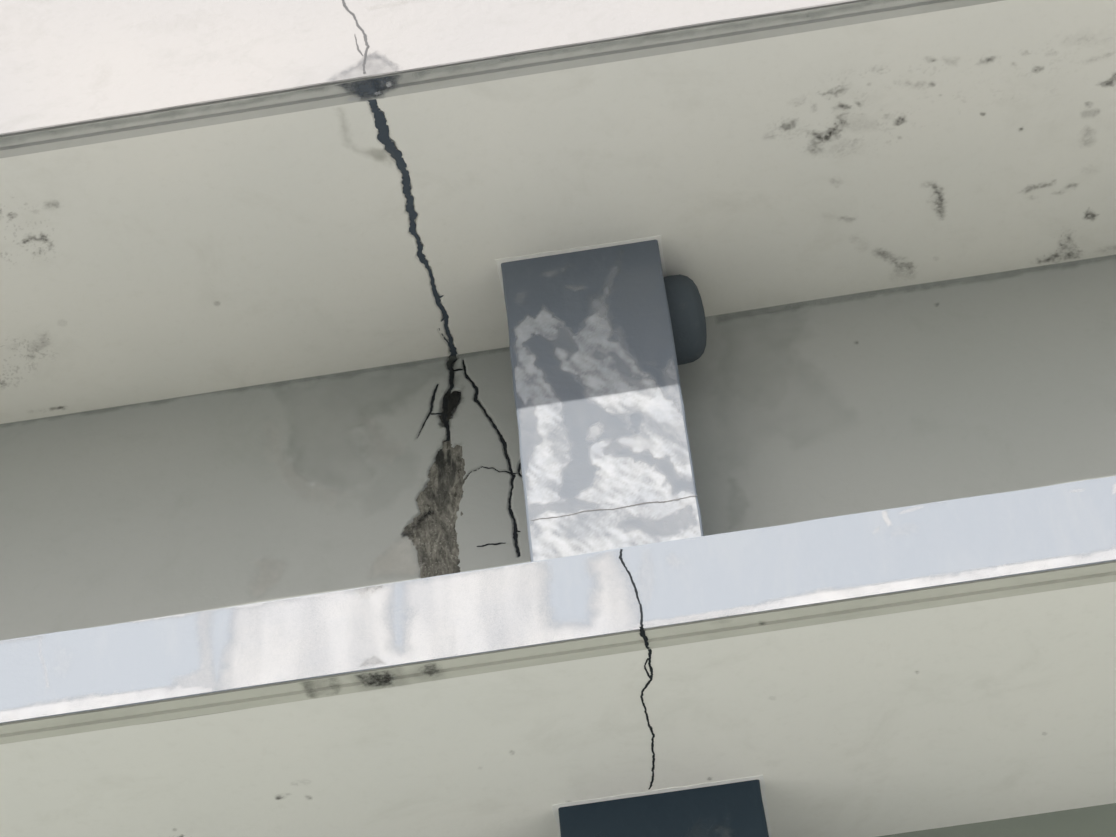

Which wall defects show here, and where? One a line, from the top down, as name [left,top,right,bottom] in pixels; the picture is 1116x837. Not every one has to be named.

crack [342,0,698,557]
peeling [0,309,1116,723]
crack [619,549,655,789]